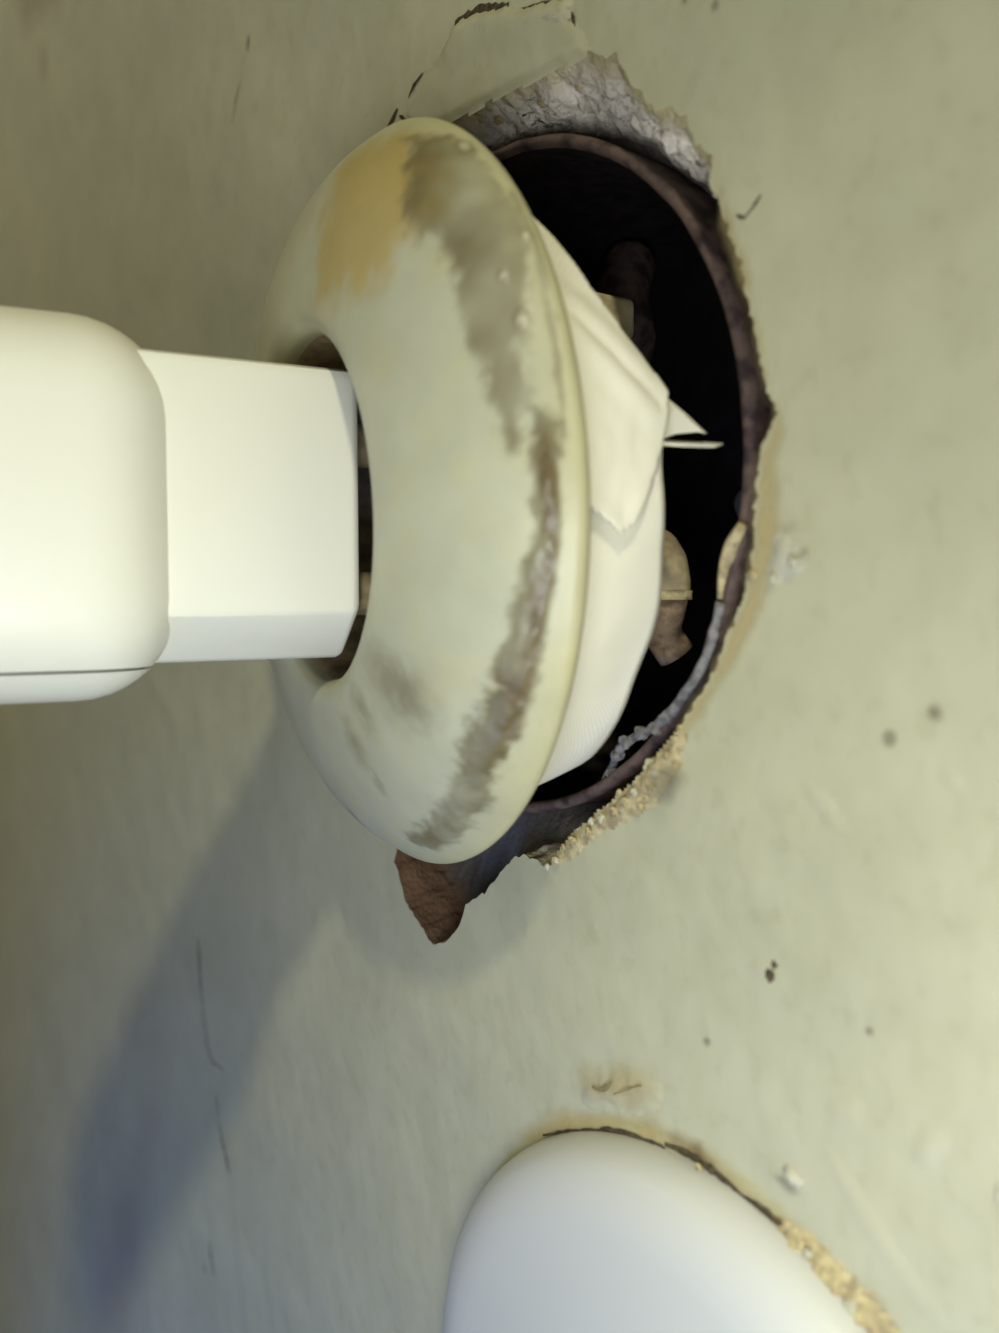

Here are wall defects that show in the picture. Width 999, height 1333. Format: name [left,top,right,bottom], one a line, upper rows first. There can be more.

spalling [406,0,719,201]
spalling [746,532,807,583]
spalling [394,724,688,945]
spalling [770,1211,900,1333]